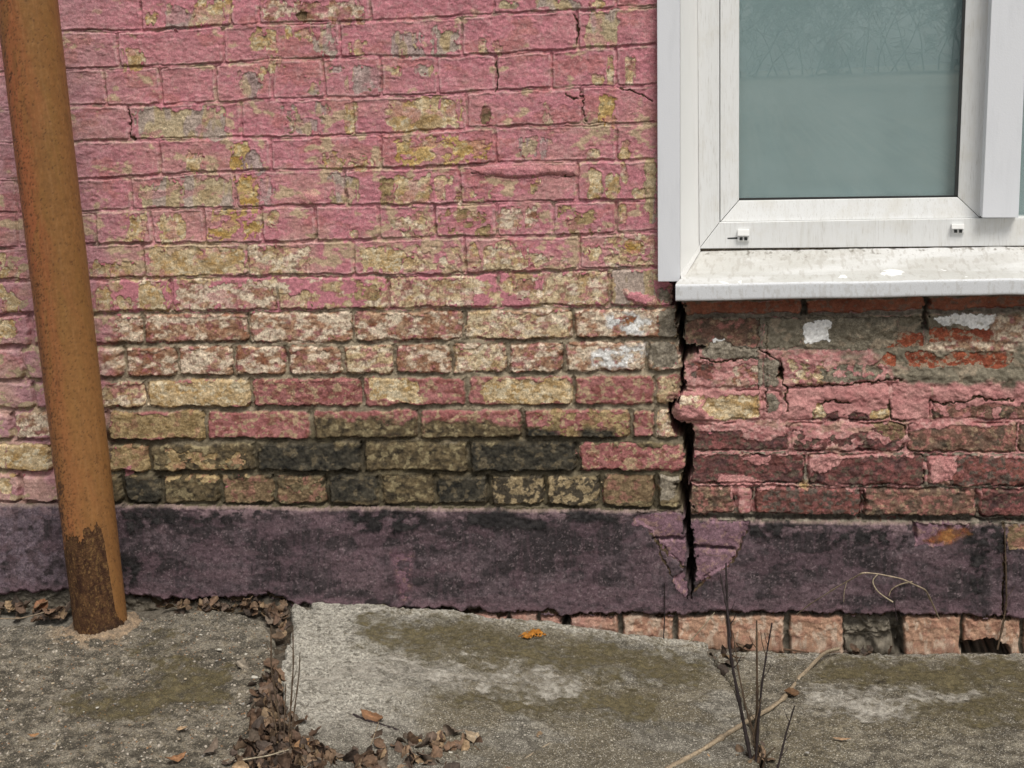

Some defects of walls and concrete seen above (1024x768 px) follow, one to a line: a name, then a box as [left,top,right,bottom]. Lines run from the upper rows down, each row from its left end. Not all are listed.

peeling [0,253,22,339]
peeling [89,0,1024,597]
peeling [0,411,53,494]
crack [428,281,1014,621]
leakage [390,550,413,601]
leakage [970,550,989,594]